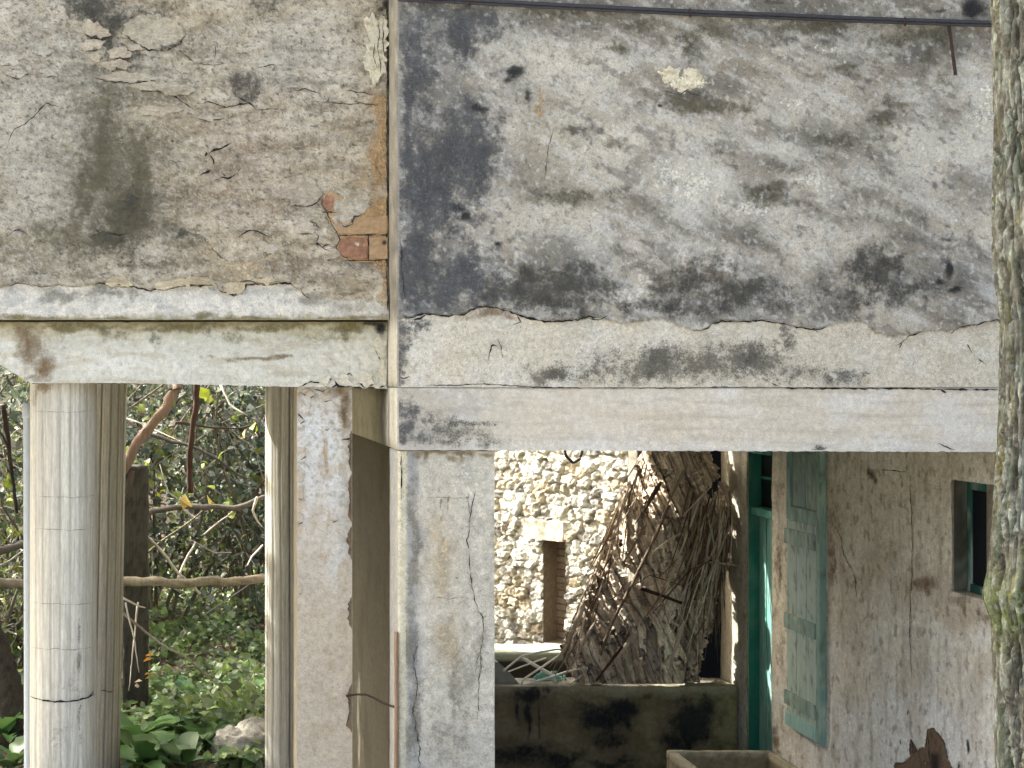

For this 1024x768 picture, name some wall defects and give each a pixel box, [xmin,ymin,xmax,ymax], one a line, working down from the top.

crack [8,103,58,141]
flaking render [81,13,196,118]
flaking render [363,0,389,87]
flaking render [657,65,705,107]
damp [32,88,199,253]
spalling [281,174,389,263]
crack [161,0,607,358]
damp [399,3,869,386]
damp [819,243,961,313]
damp [399,402,496,484]
crack [426,490,484,719]
crack [32,690,113,703]